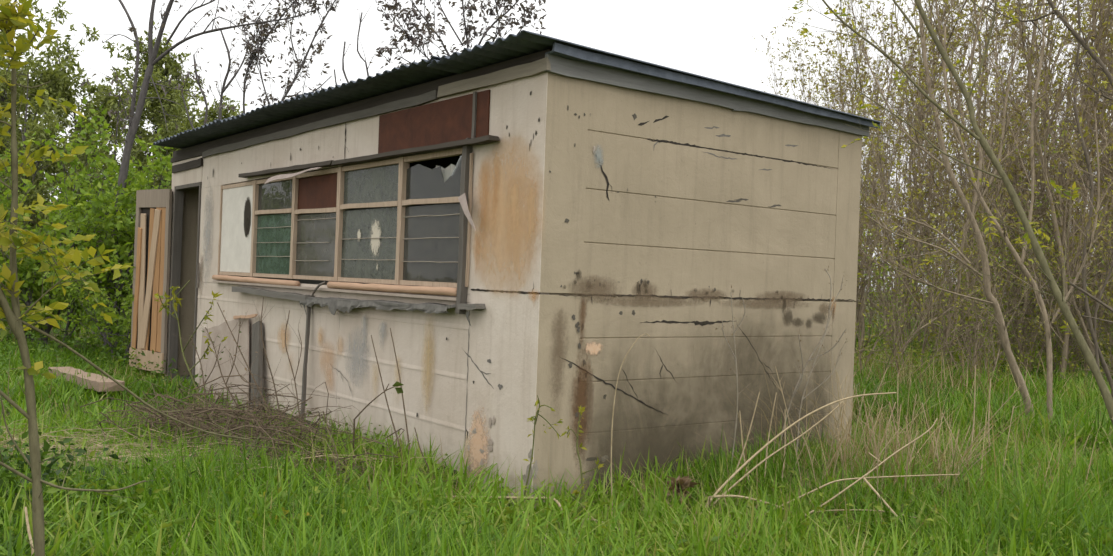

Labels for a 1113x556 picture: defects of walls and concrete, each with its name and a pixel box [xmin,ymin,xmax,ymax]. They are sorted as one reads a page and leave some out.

crack [648,139,832,169]
crack [596,155,612,200]
leakage [574,272,720,305]
crack [464,283,851,459]